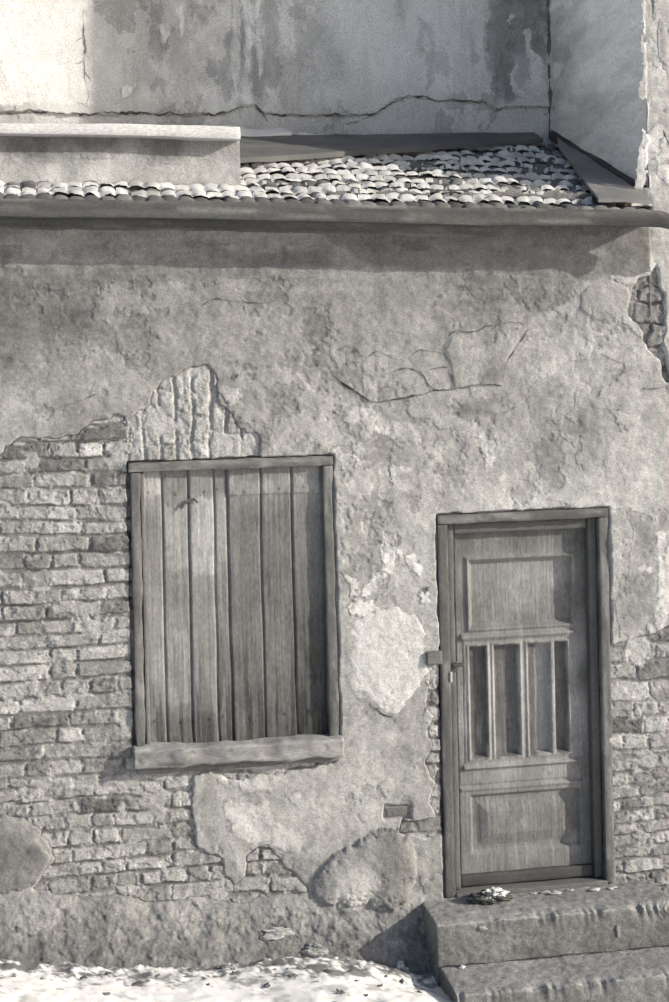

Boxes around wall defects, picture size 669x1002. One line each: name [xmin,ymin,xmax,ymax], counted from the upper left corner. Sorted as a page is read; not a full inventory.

crack [5,0,553,131]
leakage [293,8,354,90]
leakage [461,0,551,107]
spalling [634,123,669,189]
crack [330,322,529,406]
spalling [610,256,669,382]
peeling [329,442,367,473]
peeling [343,404,422,446]
peeling [476,430,503,470]
flaking render [0,364,328,904]
flaking render [383,665,443,837]
flaking render [609,529,669,895]